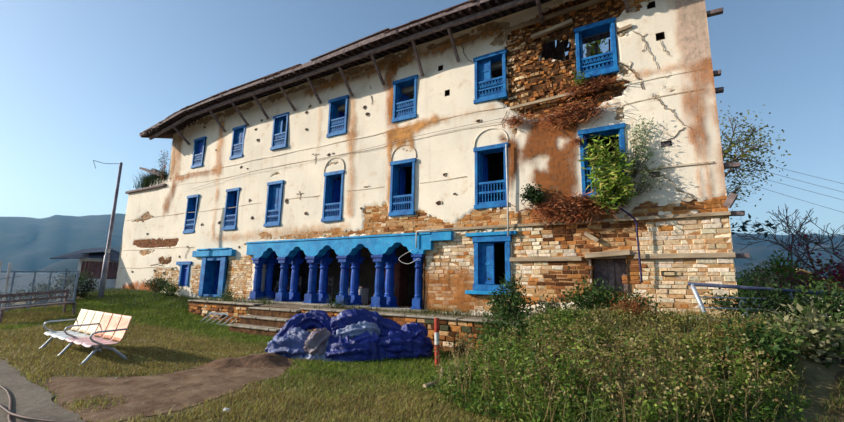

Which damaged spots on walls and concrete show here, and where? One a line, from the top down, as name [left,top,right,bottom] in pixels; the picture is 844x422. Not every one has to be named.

leakage [164,133,206,211]
leakage [216,121,224,175]
peeling [175,46,414,134]
leakage [305,29,502,212]
spalling [426,0,650,140]
crack [617,31,690,141]
leakage [683,60,715,147]
spalling [133,233,181,291]
spalling [190,265,201,295]
spalling [258,196,738,318]